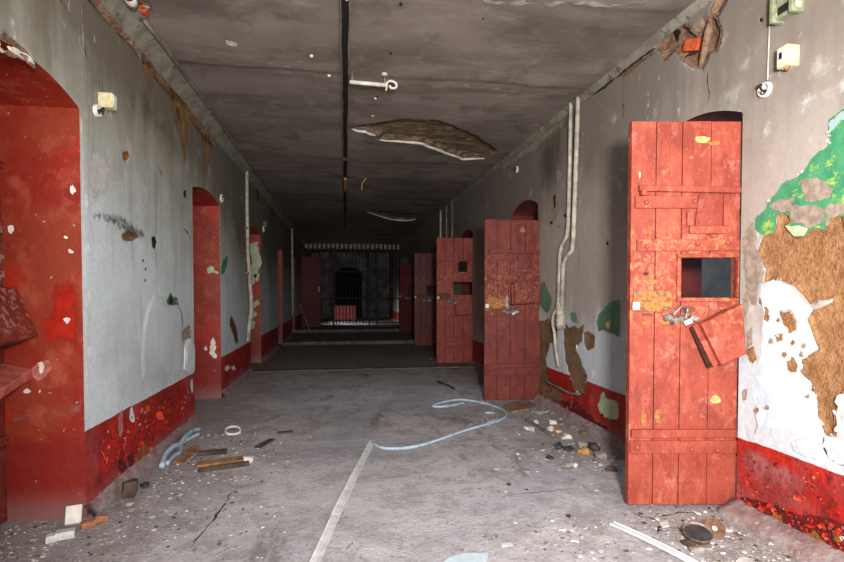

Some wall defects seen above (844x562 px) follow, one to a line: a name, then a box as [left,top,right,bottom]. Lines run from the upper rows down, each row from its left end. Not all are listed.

spalling [658,0,728,101]
spalling [352,119,496,161]
peeling [250,242,263,287]
spalling [741,109,844,438]
spalling [539,282,621,430]
crack [192,485,240,546]
peeling [737,452,844,552]